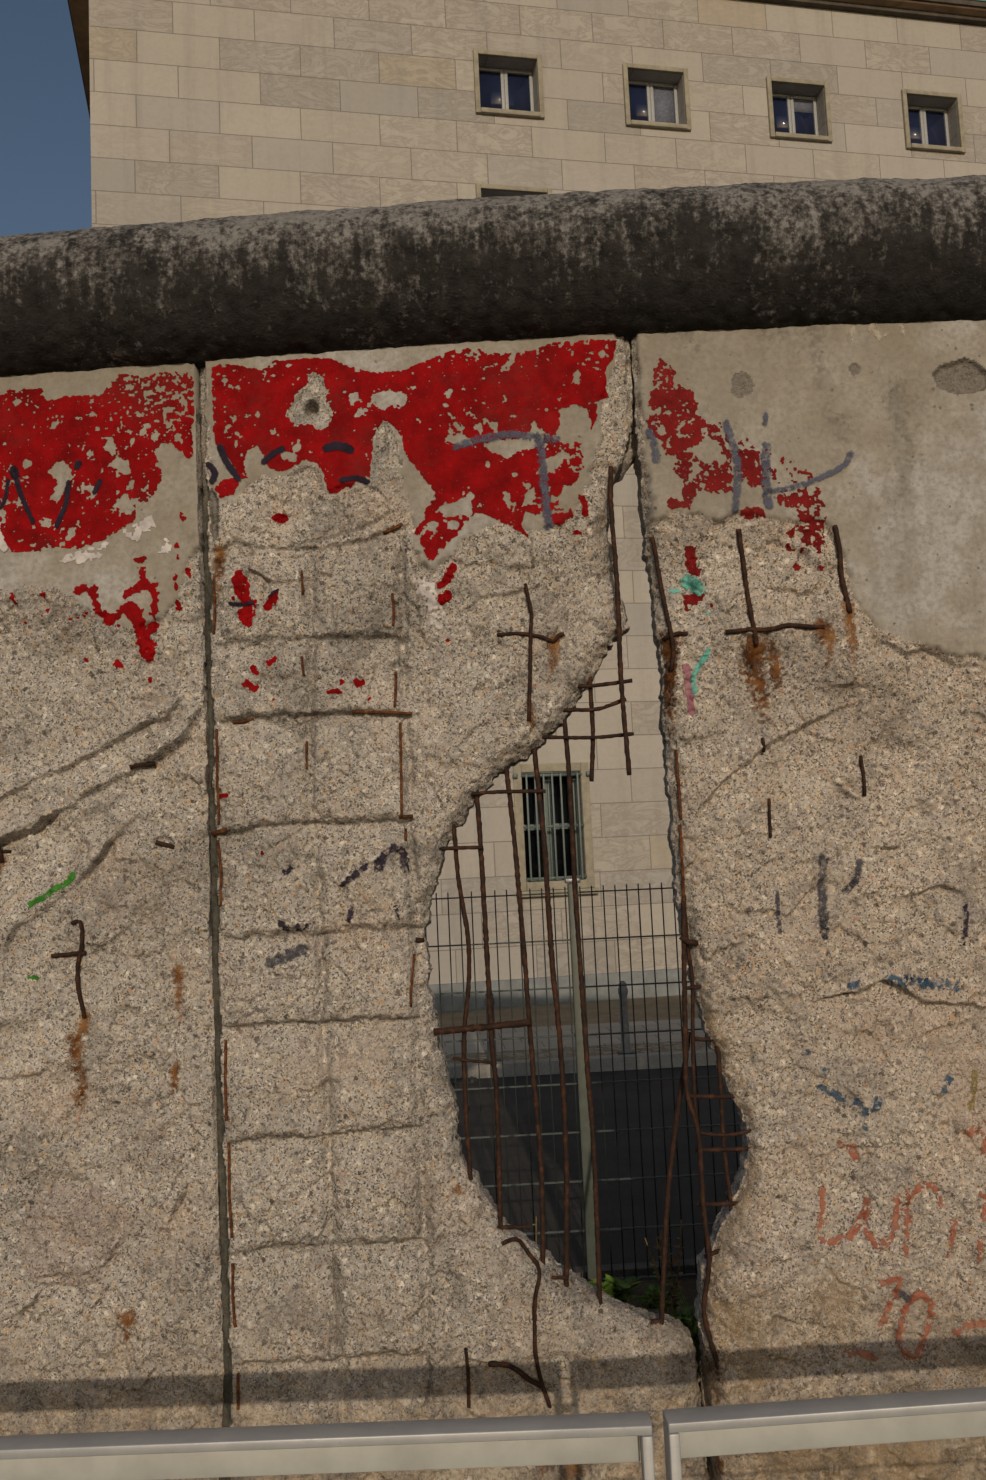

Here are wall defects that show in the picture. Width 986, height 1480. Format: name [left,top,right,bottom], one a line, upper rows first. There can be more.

rust [660,632,679,735]
rust [739,632,783,724]
rust [816,602,857,662]
spalling [0,336,986,1480]
rust [67,1012,90,1108]
rust [117,1310,136,1341]